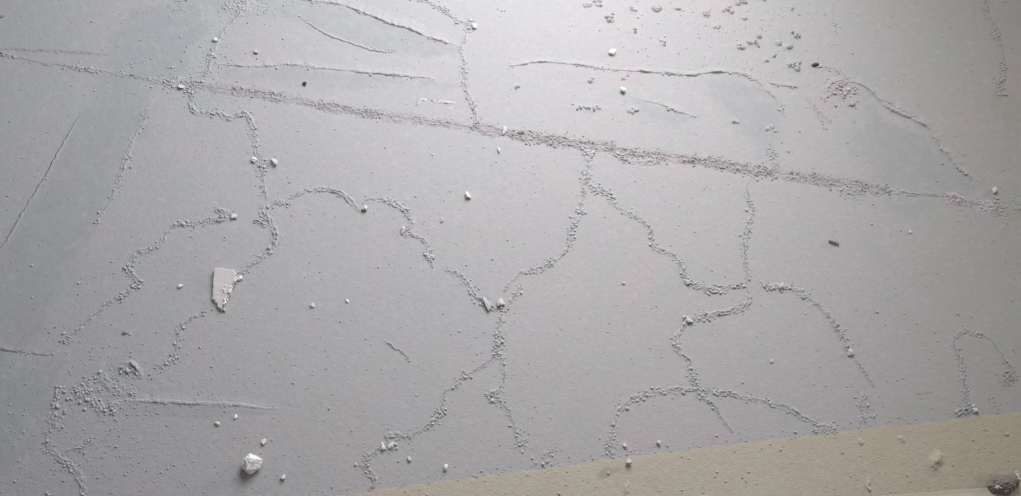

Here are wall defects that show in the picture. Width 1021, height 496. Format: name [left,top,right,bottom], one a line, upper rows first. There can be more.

crack [0,0,1010,292]
crack [40,310,206,496]
crack [59,208,239,345]
crack [354,267,557,492]
crack [605,178,838,457]
crack [759,281,877,425]
crack [951,325,1019,418]